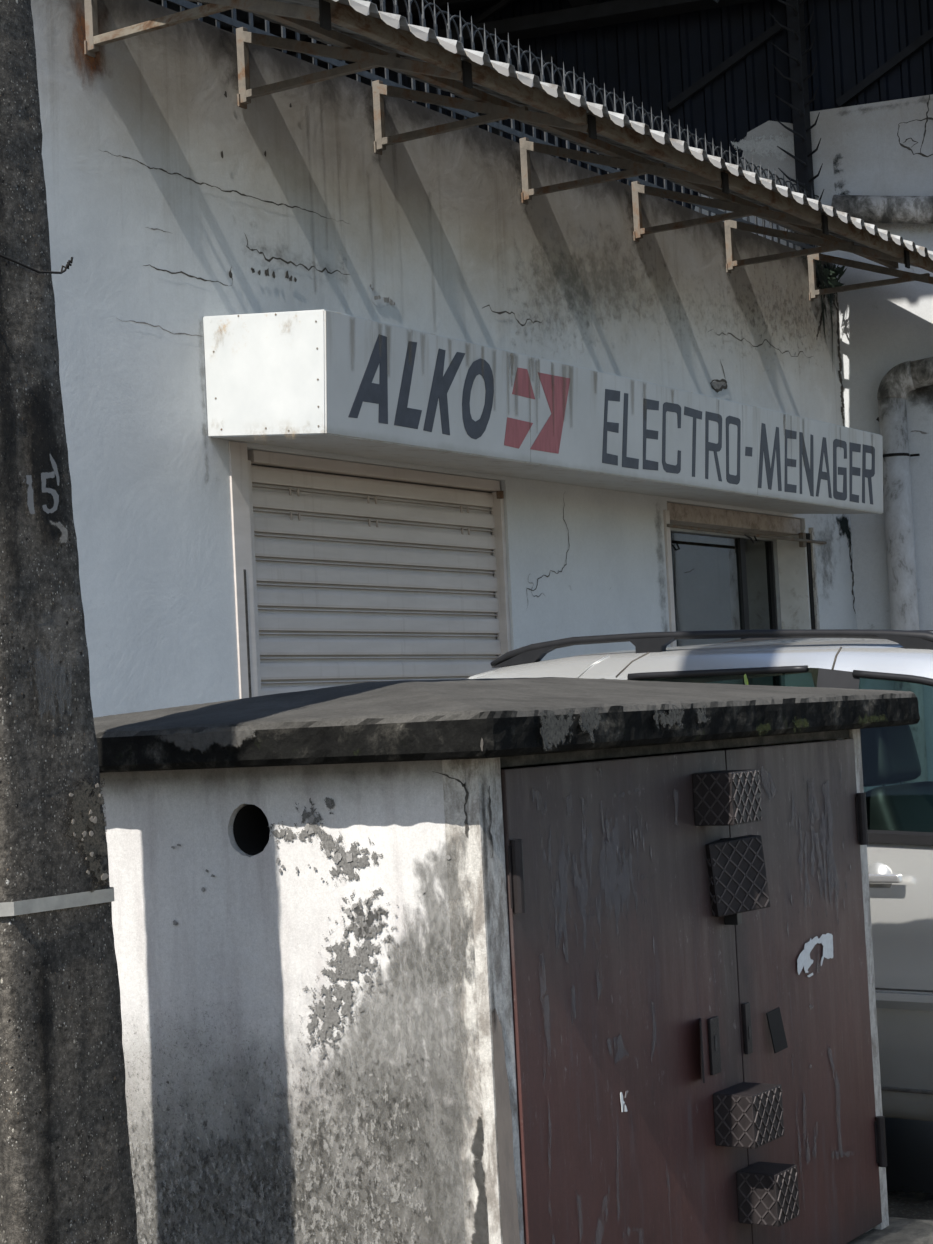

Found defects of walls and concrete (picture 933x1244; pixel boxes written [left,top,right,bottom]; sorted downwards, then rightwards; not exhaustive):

crack [897,95,933,157]
crack [102,151,349,224]
crack [143,235,350,286]
water stain [801,256,838,362]
crack [526,495,570,607]
water stain [836,516,852,547]
spalling [65,775,109,893]